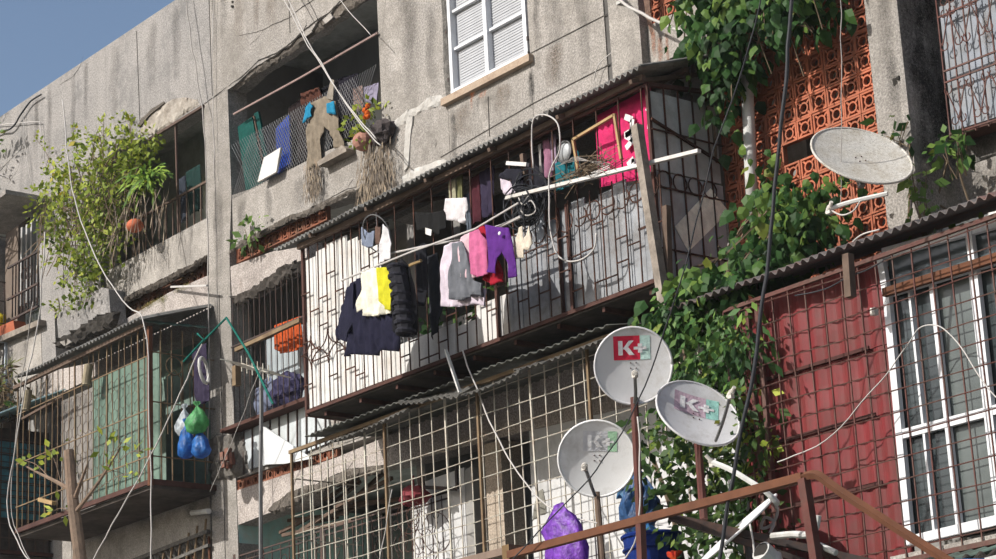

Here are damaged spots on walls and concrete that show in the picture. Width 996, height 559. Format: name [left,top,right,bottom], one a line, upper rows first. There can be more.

spalling [138,97,199,136]
peeling [394,0,451,183]
water stain [902,0,949,137]